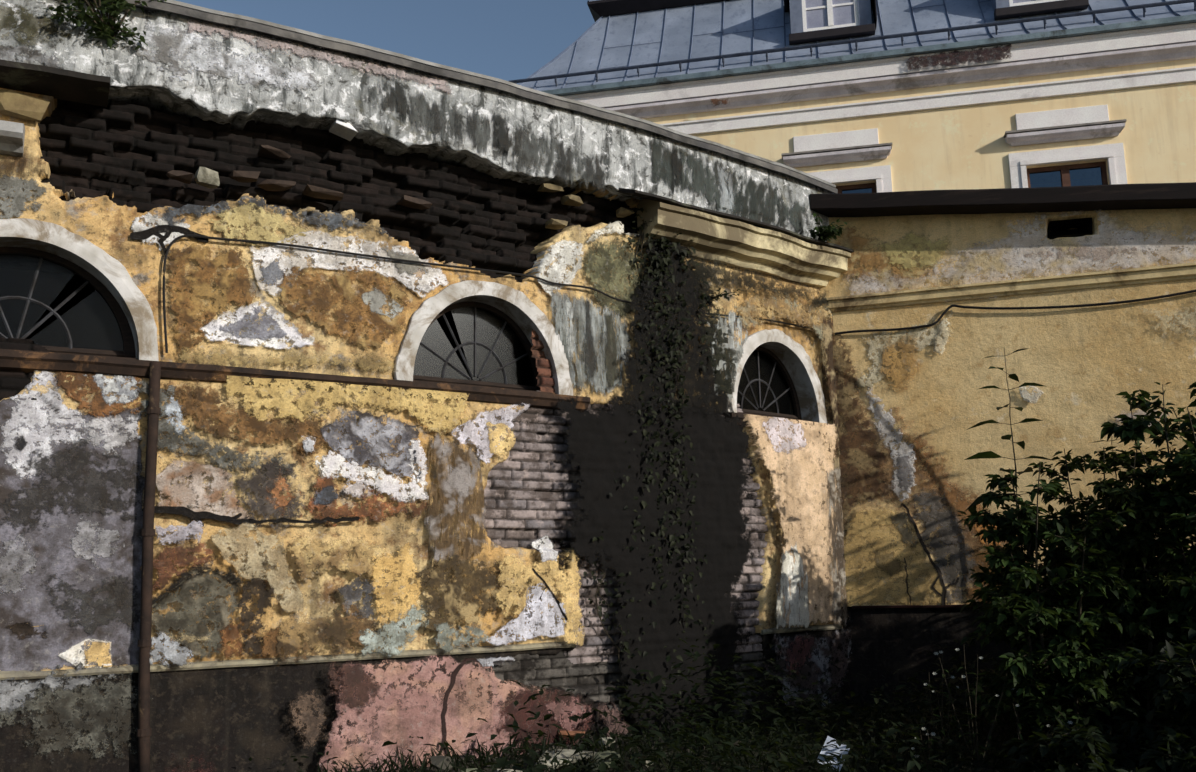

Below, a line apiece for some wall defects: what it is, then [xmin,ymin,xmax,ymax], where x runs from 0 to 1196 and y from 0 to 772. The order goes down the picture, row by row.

spalling [0,99,639,349]
leakage [366,80,610,191]
leakage [650,139,808,233]
spalling [530,329,555,393]
peeling [707,311,748,419]
peeling [0,370,304,672]
crack [142,506,360,527]
spalling [290,403,769,772]
leakage [551,237,987,711]
peeling [762,417,807,453]
peeling [776,545,809,629]
crack [901,503,959,605]